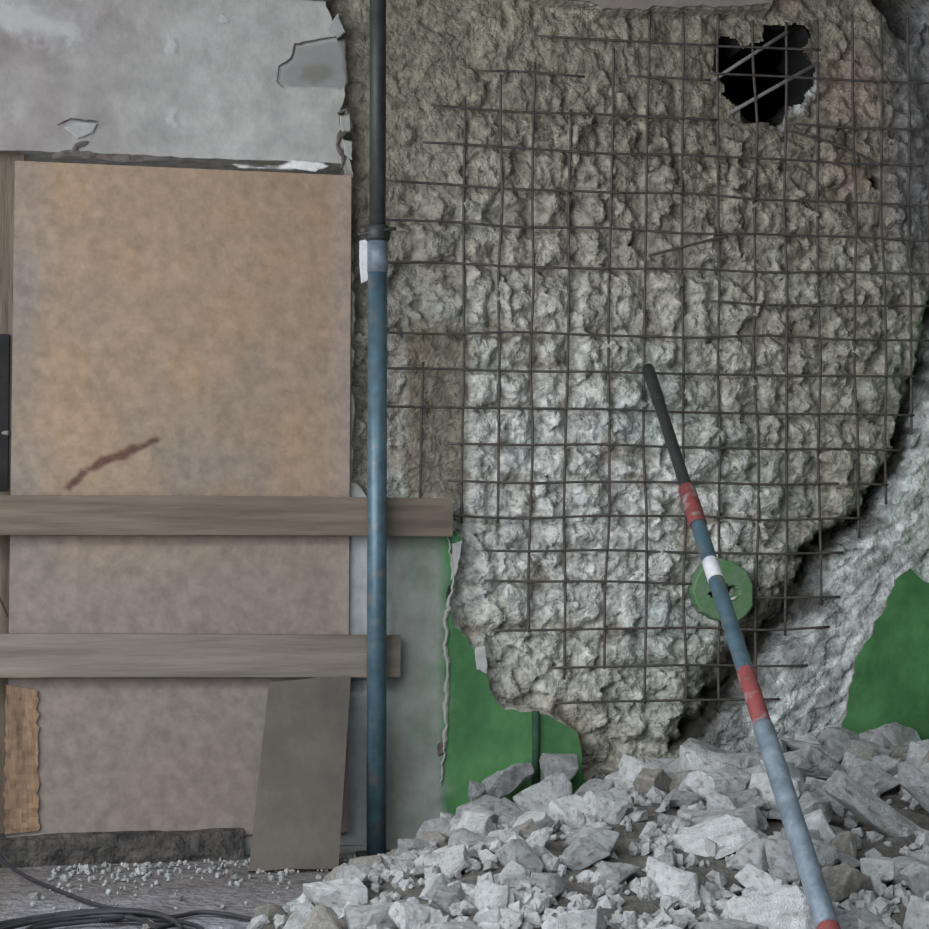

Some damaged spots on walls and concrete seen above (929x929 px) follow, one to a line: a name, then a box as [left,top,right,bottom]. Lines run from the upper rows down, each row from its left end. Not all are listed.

flaking render [48,118,170,162]
spalling [276,0,370,497]
spalling [386,0,929,786]